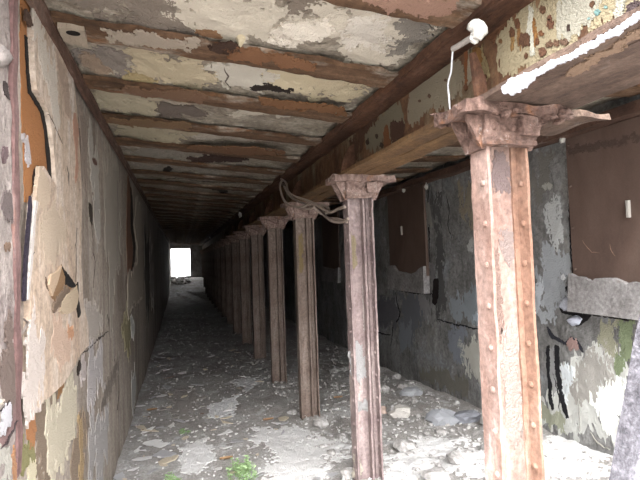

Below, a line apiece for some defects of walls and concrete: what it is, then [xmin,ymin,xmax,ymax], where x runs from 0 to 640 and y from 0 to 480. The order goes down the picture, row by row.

spalling [78,51,113,76]
spalling [195,29,223,39]
hole [249,82,294,94]
peeling [362,0,616,153]
water stain [501,0,640,96]
spalling [186,154,249,163]
flaking render [0,9,89,437]
flaking render [542,182,564,252]
crack [378,290,432,343]
hole [560,308,591,327]
flaking render [549,348,557,397]